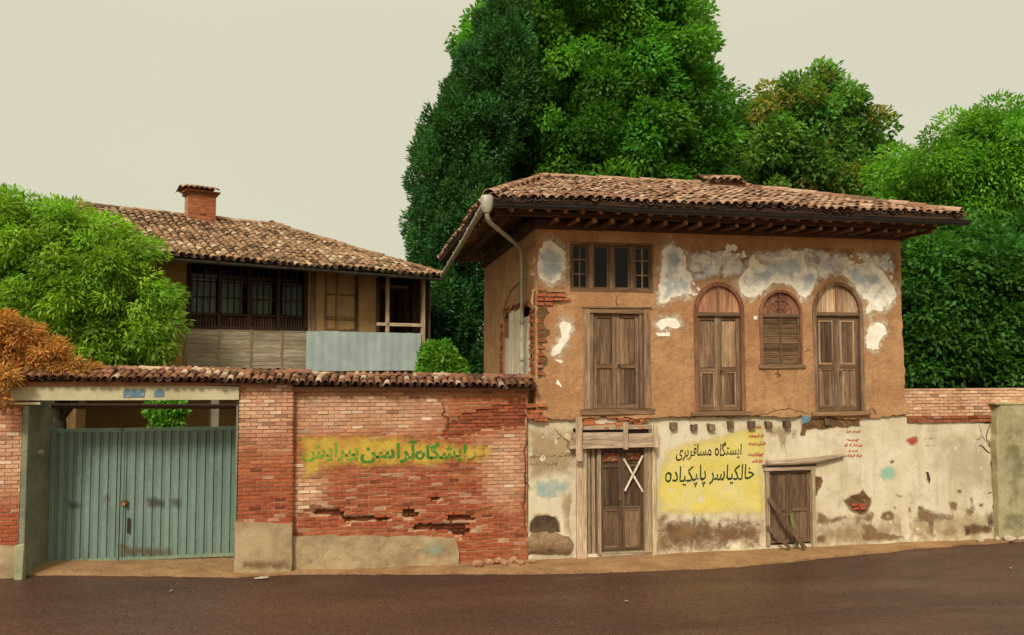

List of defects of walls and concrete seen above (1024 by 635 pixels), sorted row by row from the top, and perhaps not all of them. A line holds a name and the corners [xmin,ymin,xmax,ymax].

peeling [499,236,575,382]
peeling [653,236,900,354]
spalling [800,417,860,435]
spalling [315,509,389,521]
spalling [402,508,475,535]
leakage [658,516,759,550]
spalling [843,489,872,514]
leakage [817,508,901,542]
leakage [909,498,993,535]